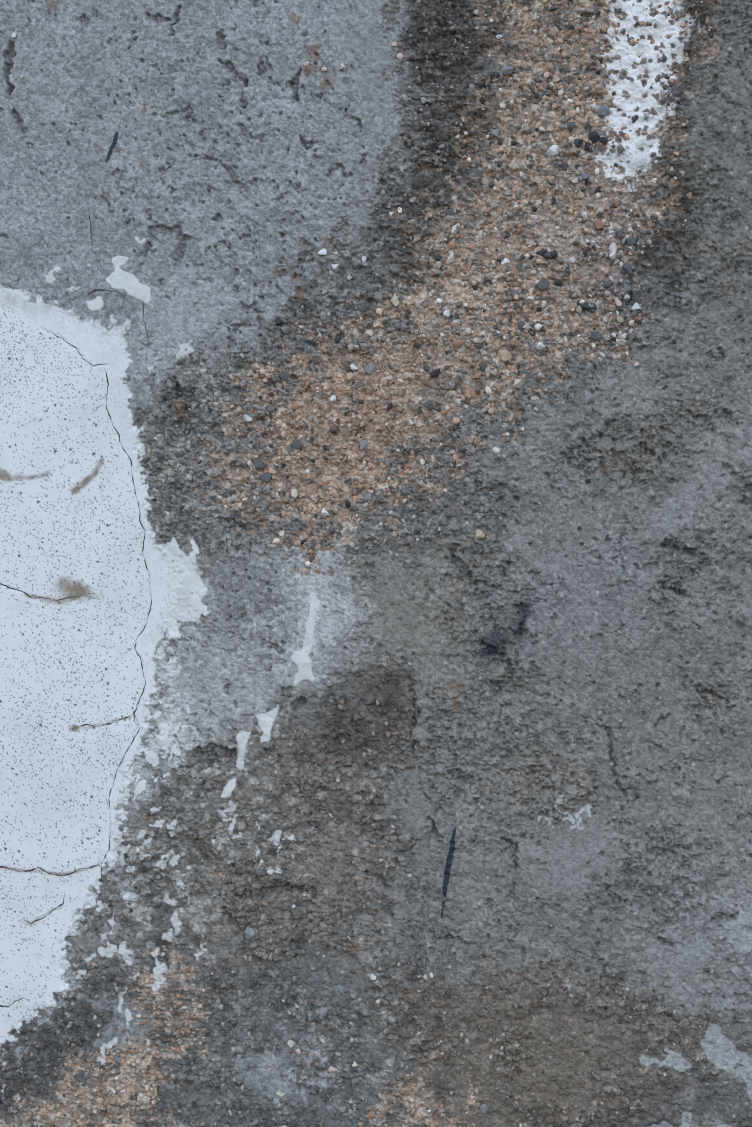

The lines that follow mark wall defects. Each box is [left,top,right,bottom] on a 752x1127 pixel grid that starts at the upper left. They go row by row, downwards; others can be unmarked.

peeling [68,286,131,336]
crack [87,289,154,375]
peeling [106,256,151,303]
spalling [133,0,725,686]
crack [0,332,152,928]
peeling [218,705,280,839]
peeling [538,793,592,830]
peeling [256,830,295,875]
spalling [355,1052,482,1127]
peeling [639,1048,692,1072]
peeling [640,1110,733,1127]
peeling [700,1024,752,1101]